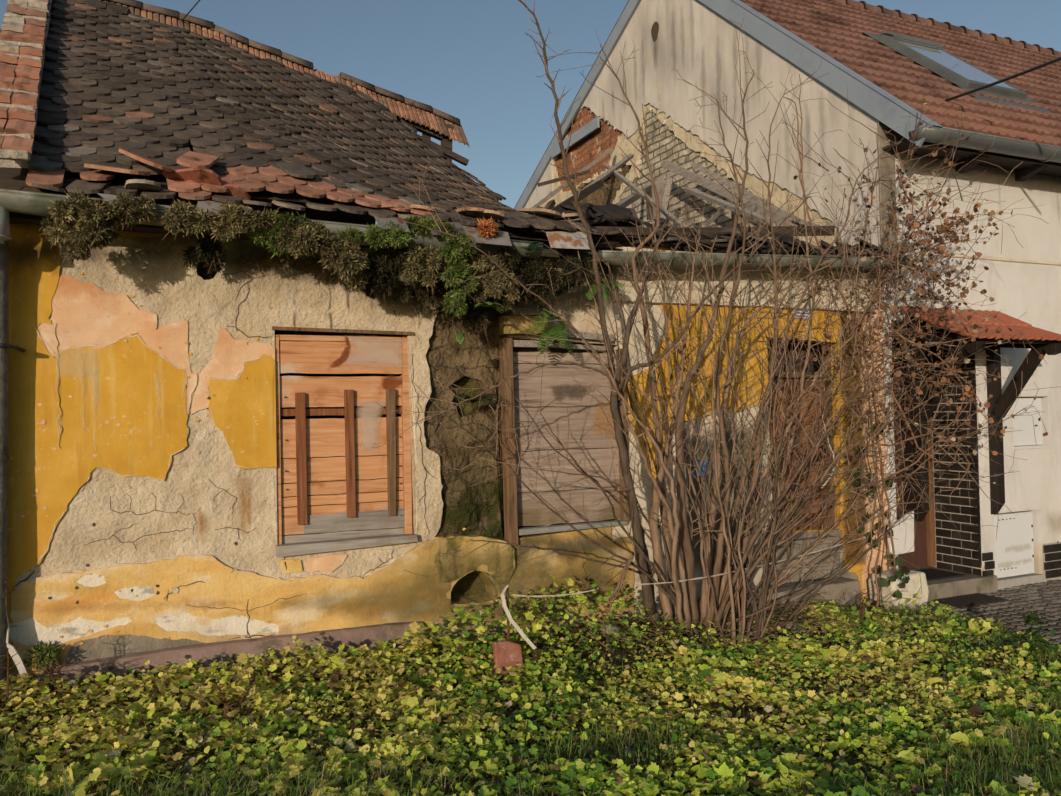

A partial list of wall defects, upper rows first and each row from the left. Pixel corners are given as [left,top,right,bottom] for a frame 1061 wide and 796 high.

spalling [541,104,840,246]
spalling [509,230,549,243]
crack [224,271,268,345]
spalling [5,235,773,683]
crack [84,479,254,549]